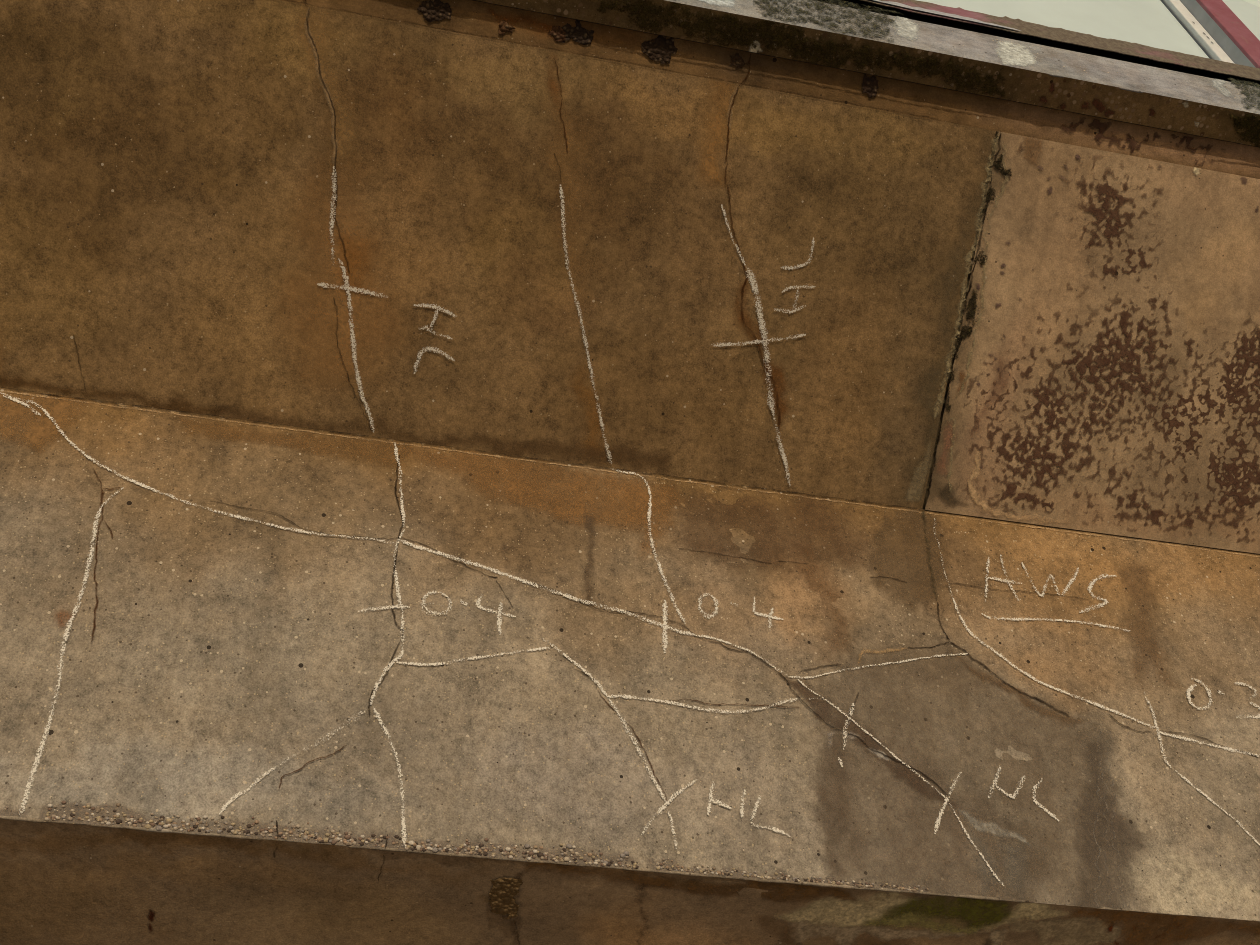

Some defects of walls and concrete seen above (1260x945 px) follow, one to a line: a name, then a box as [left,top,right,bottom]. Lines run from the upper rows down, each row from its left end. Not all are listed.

crack [305,0,349,271]
crack [725,52,781,430]
leakage [891,16,918,40]
leakage [996,41,1035,66]
peeling [1038,154,1161,280]
peeling [1062,119,1211,165]
leakage [1212,79,1231,97]
peeling [967,298,1260,542]
crack [90,470,120,643]
crack [219,460,1088,799]
leakage [528,741,1260,945]
leakage [888,669,1060,895]